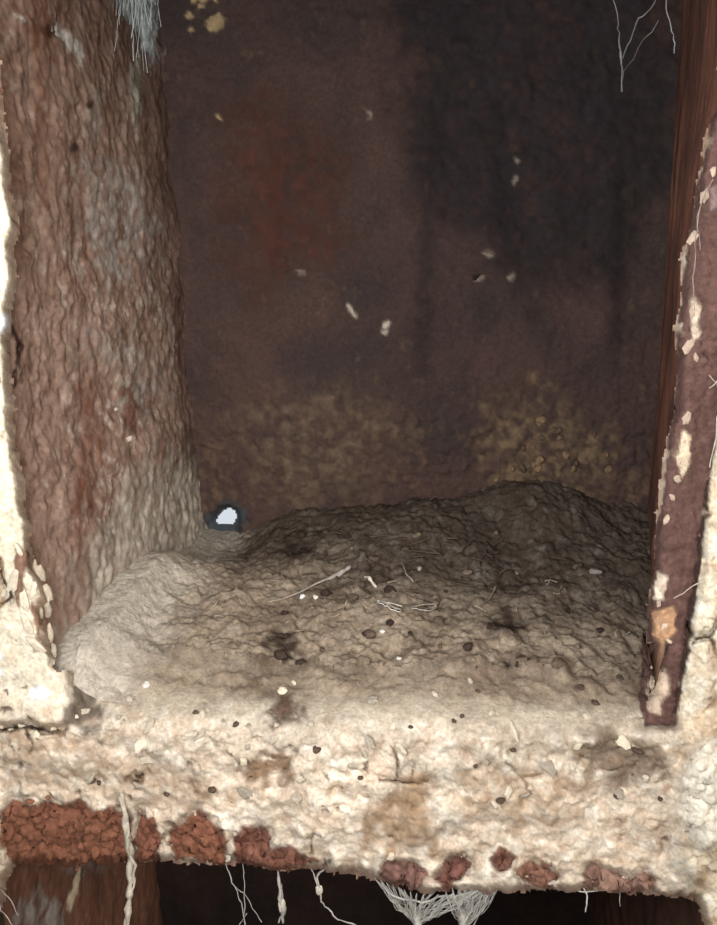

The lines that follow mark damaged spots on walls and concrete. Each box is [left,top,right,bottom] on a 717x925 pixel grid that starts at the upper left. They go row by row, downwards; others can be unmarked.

flaking render [0,544,57,659]
crack [689,625,717,651]
crack [0,724,66,754]